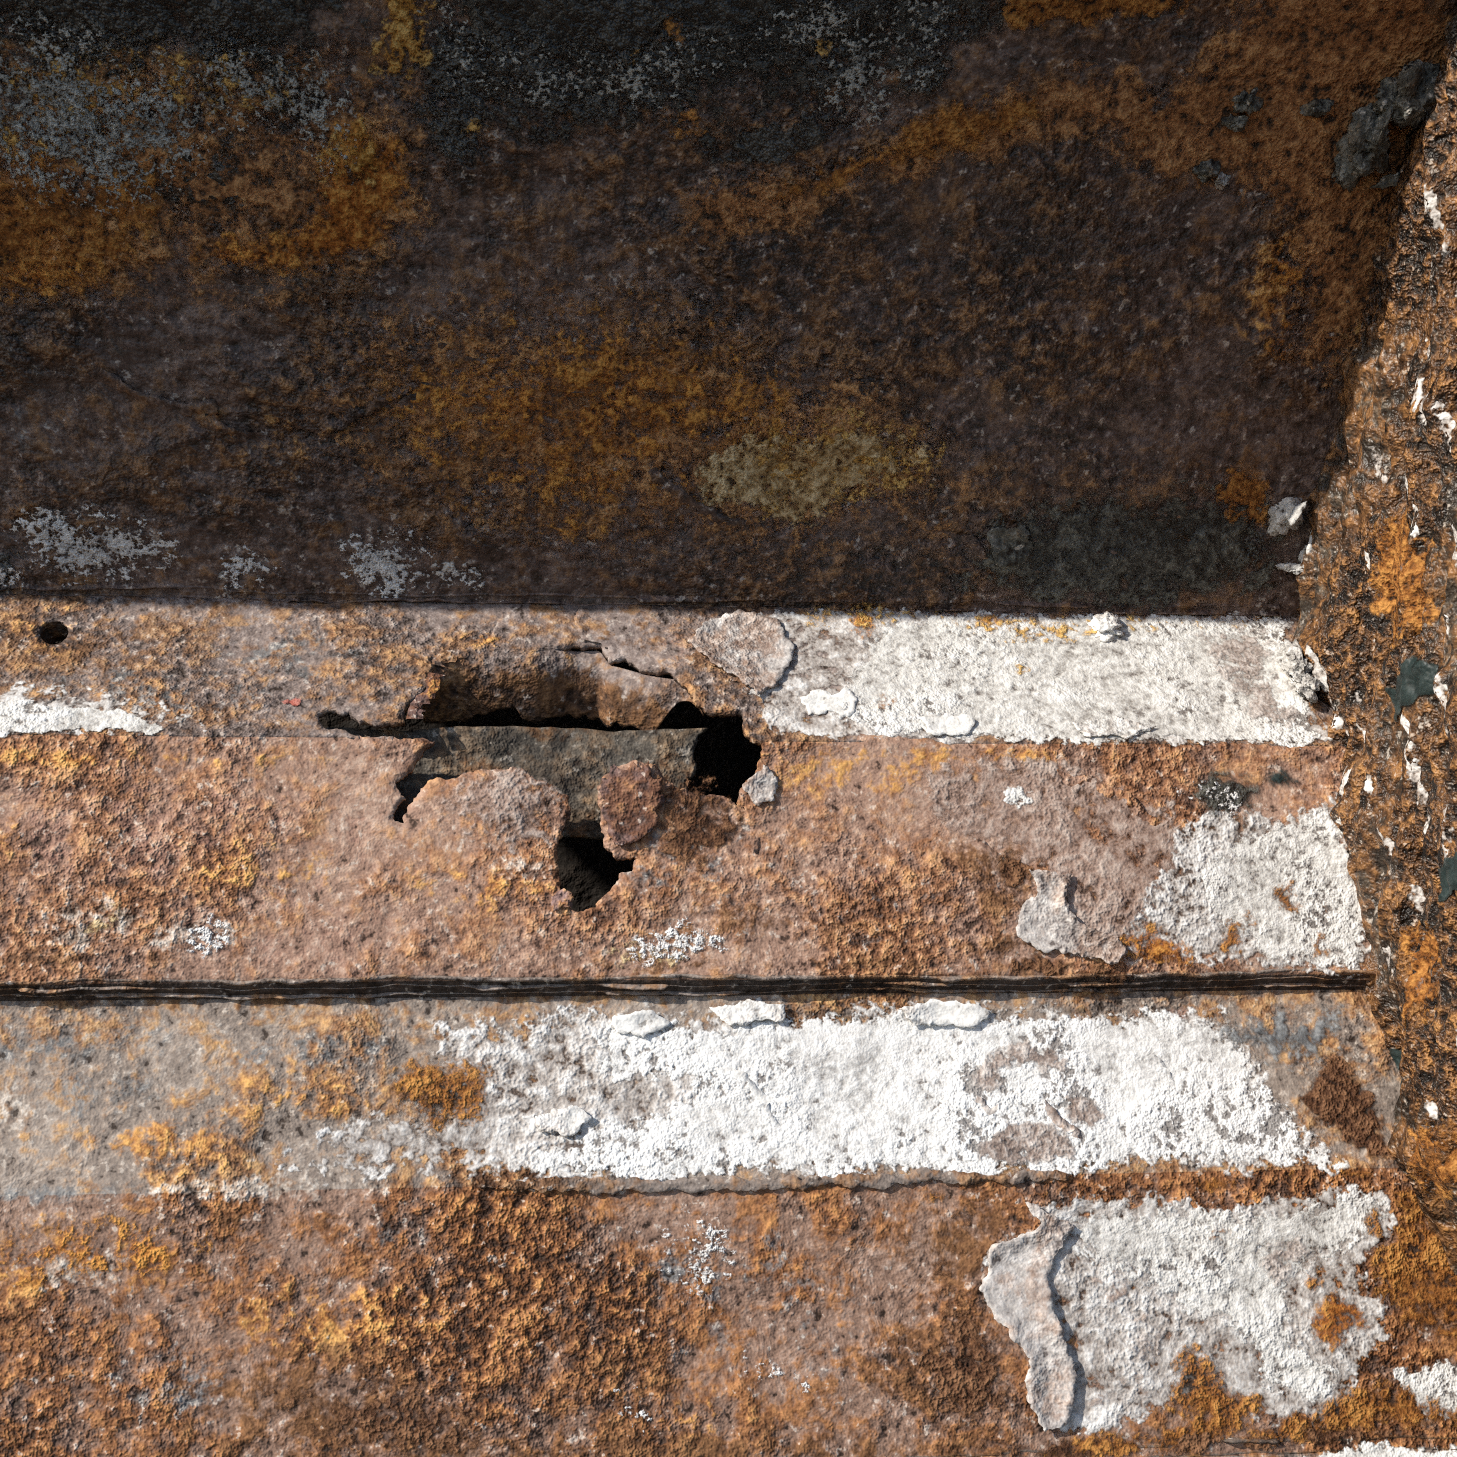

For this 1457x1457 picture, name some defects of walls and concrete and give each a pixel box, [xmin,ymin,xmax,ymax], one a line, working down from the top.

corrosion [0,0,437,309]
corrosion [685,0,1452,387]
corrosion [315,292,951,550]
corrosion [1368,511,1440,648]
peeling [1433,673,1449,734]
peeling [600,755,665,846]
peeling [687,607,1394,978]
peeling [1400,714,1454,857]
corrosion [1398,922,1442,1035]
peeling [278,996,1398,1435]
corrosion [258,1360,481,1457]
peeling [1393,1359,1457,1420]